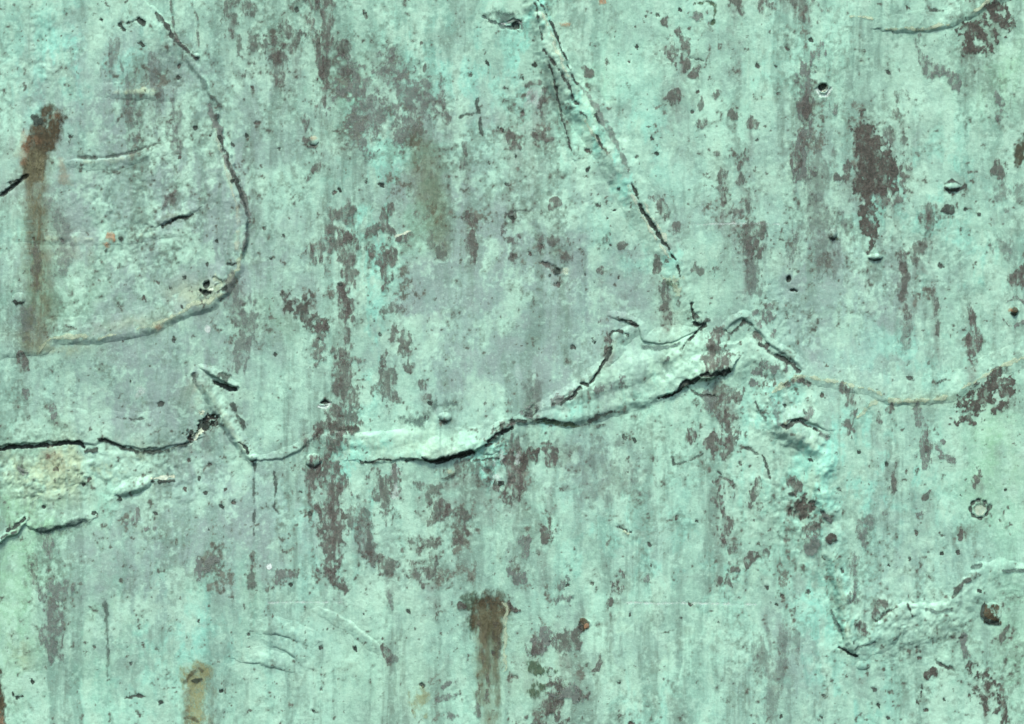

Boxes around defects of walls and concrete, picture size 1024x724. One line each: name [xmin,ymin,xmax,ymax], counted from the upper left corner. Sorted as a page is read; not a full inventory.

crack [118,0,199,57]
crack [78,144,156,159]
crack [482,0,680,274]
rust [21,104,68,346]
crack [161,214,194,228]
crack [207,95,251,292]
crack [186,372,237,392]
crack [358,303,830,464]
crack [0,438,188,475]
crack [1,517,89,539]
rust [457,589,521,717]